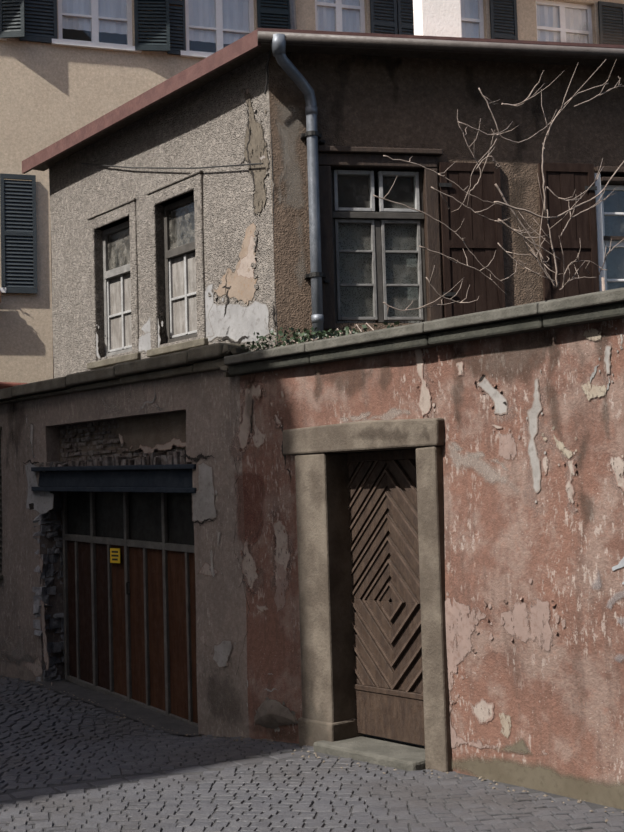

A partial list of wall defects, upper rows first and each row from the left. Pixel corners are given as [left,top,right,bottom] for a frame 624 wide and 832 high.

flaking render [205,77,274,355]
crack [241,97,259,252]
flaking render [60,419,186,462]
peeling [410,349,435,418]
flaking render [473,374,520,460]
peeling [581,328,623,400]
peeling [236,511,295,612]
peeling [445,592,566,754]